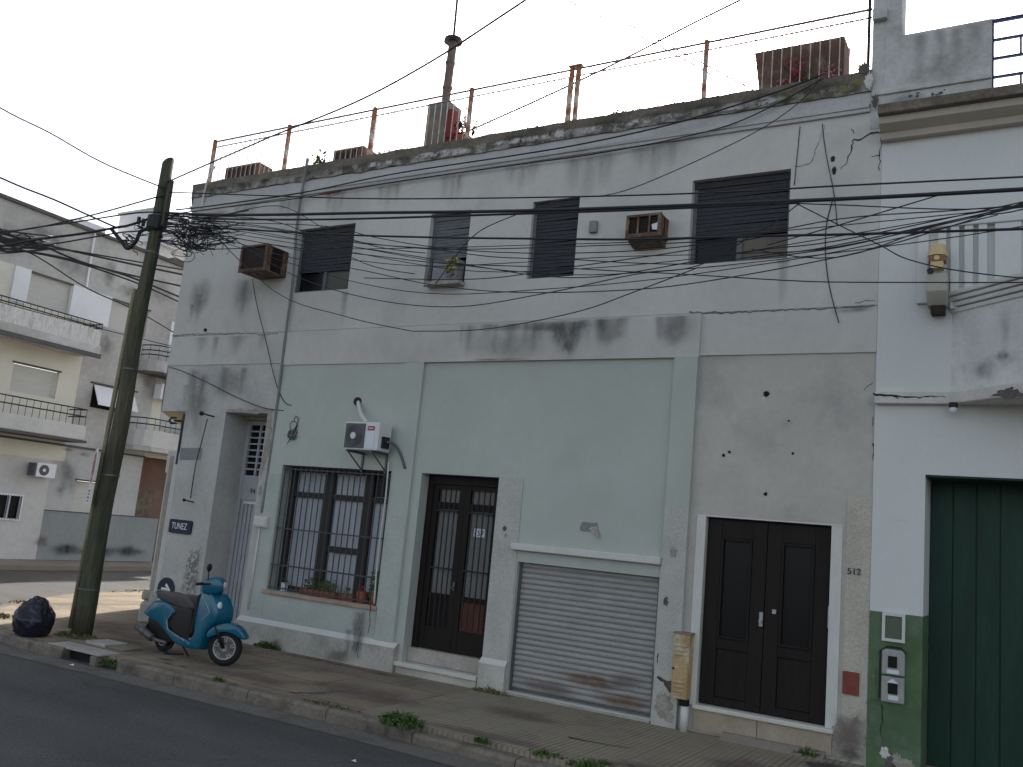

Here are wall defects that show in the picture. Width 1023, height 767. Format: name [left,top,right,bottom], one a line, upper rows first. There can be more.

crack [795,125,882,174]
crack [864,382,944,399]
spalling [654,676,674,723]
spalling [805,717,866,767]
spalling [879,747,915,767]